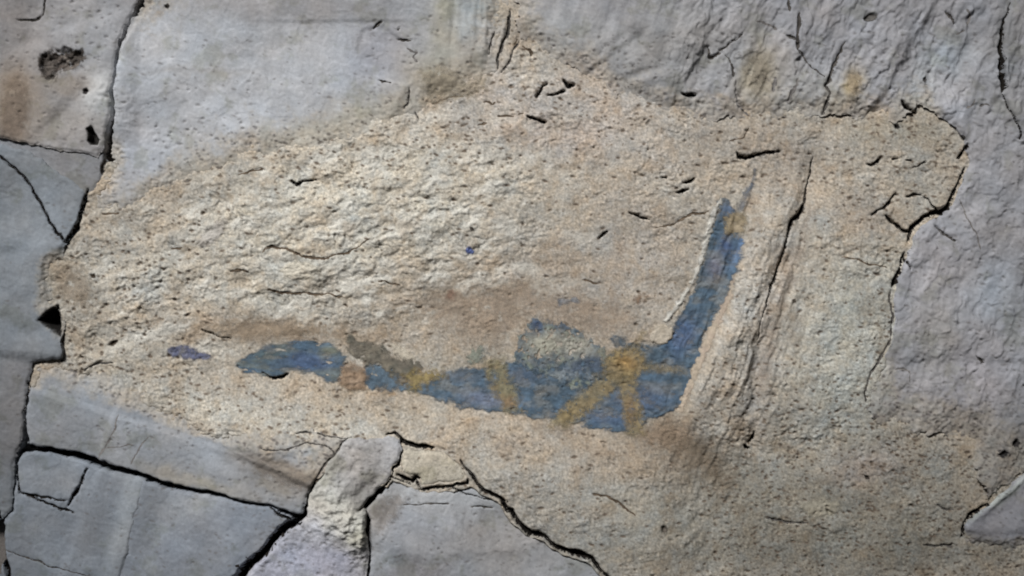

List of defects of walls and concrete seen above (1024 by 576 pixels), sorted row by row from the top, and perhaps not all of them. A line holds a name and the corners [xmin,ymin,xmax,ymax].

crack [0,121,119,244]
flaking render [198,220,225,248]
flaking render [280,261,321,279]
crack [757,157,813,340]
crack [843,145,981,402]
peeling [364,362,413,391]
flaking render [390,344,413,360]
crack [16,382,220,513]
crack [234,431,350,576]
flaking render [401,443,465,485]
crack [359,432,609,576]
flaking render [800,497,840,517]